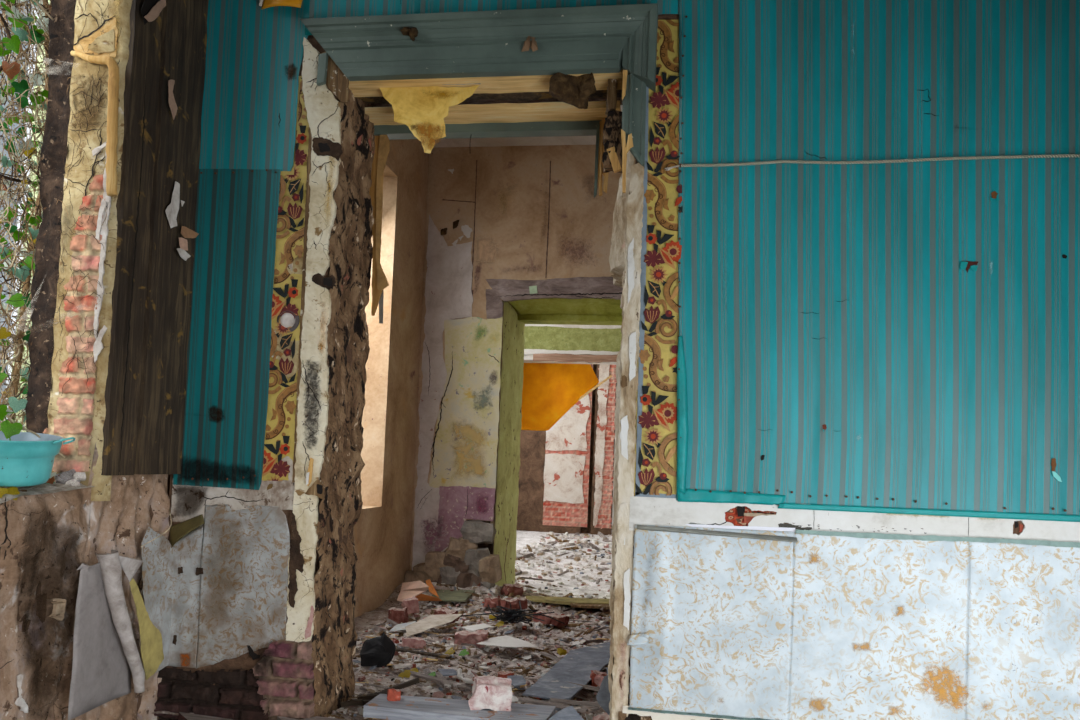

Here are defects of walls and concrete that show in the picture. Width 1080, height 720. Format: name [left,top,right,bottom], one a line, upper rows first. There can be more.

crack [0,497,11,559]
flaking render [154,37,343,720]
peeling [611,163,842,720]